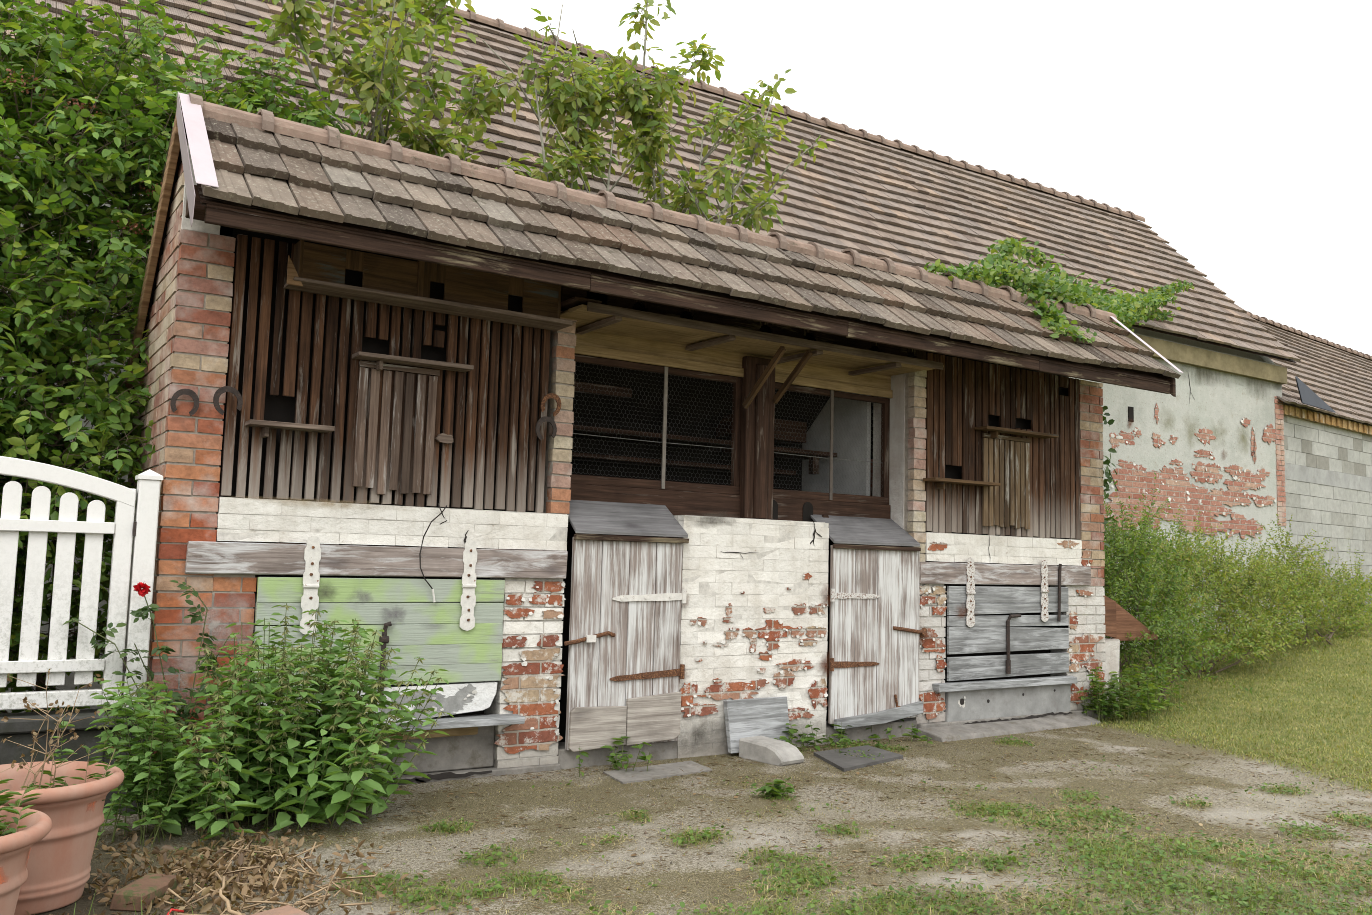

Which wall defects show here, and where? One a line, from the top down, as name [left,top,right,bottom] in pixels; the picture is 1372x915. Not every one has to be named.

flaking render [1103,403,1276,539]
peeling [494,580,566,754]
peeling [680,573,828,720]
peeling [919,584,947,672]
peeling [919,691,966,720]
peeling [1067,590,1107,704]